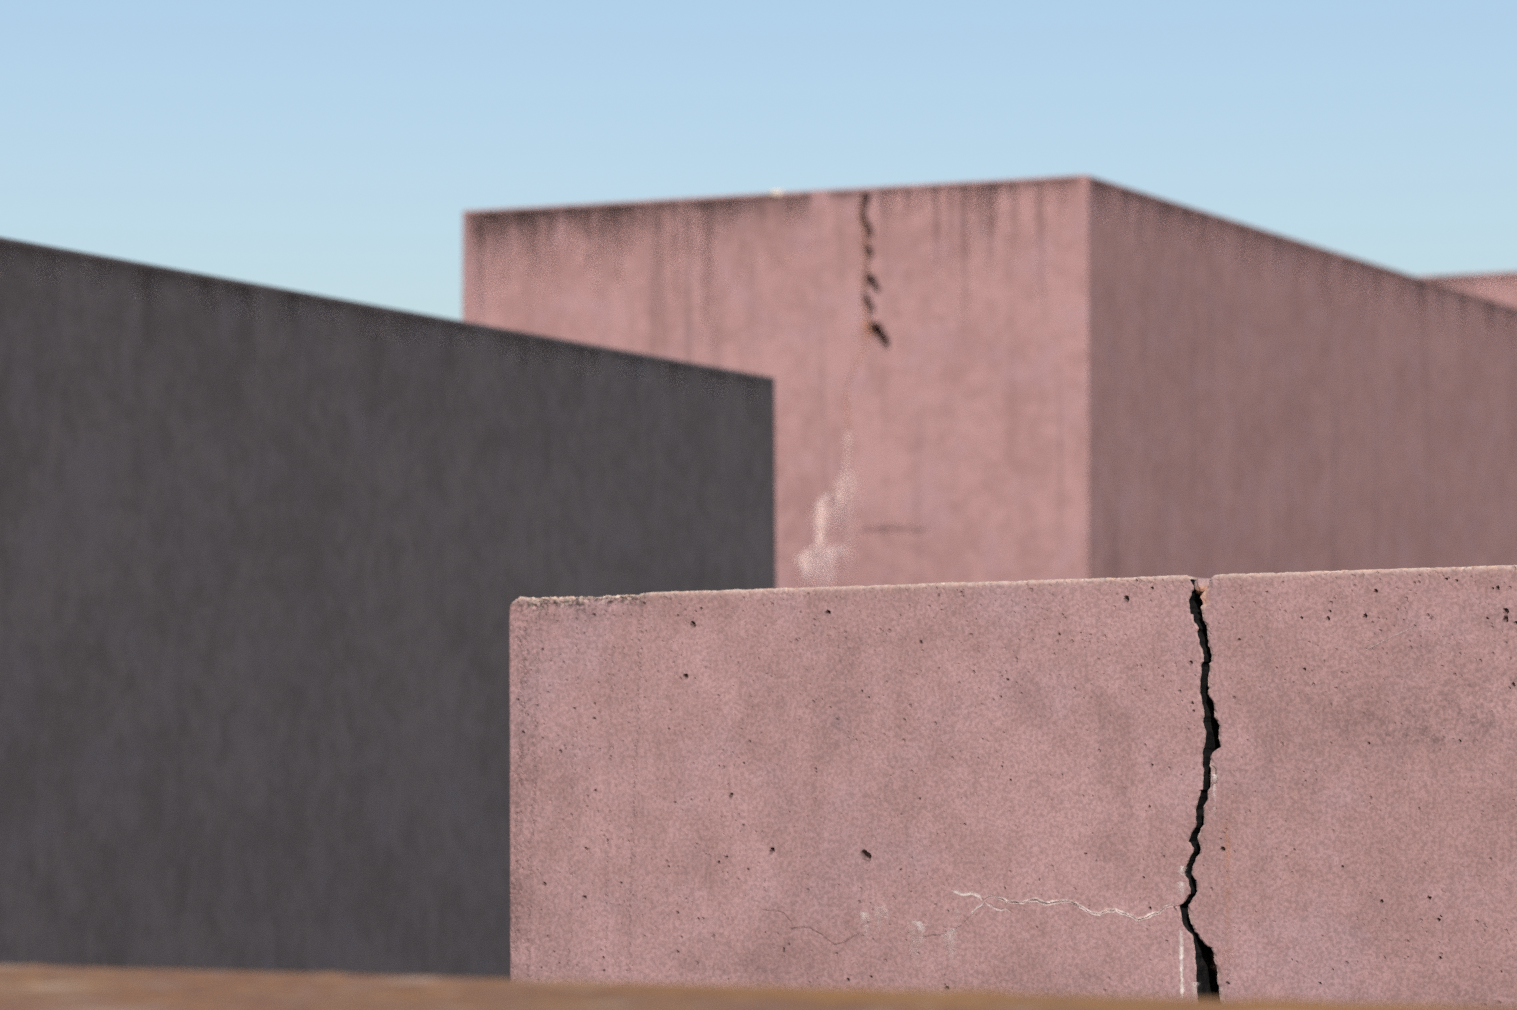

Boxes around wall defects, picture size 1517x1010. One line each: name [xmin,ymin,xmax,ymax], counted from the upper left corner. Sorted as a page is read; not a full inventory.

crack [859,191,889,351]
leakage [798,483,843,572]
crack [955,576,1227,999]